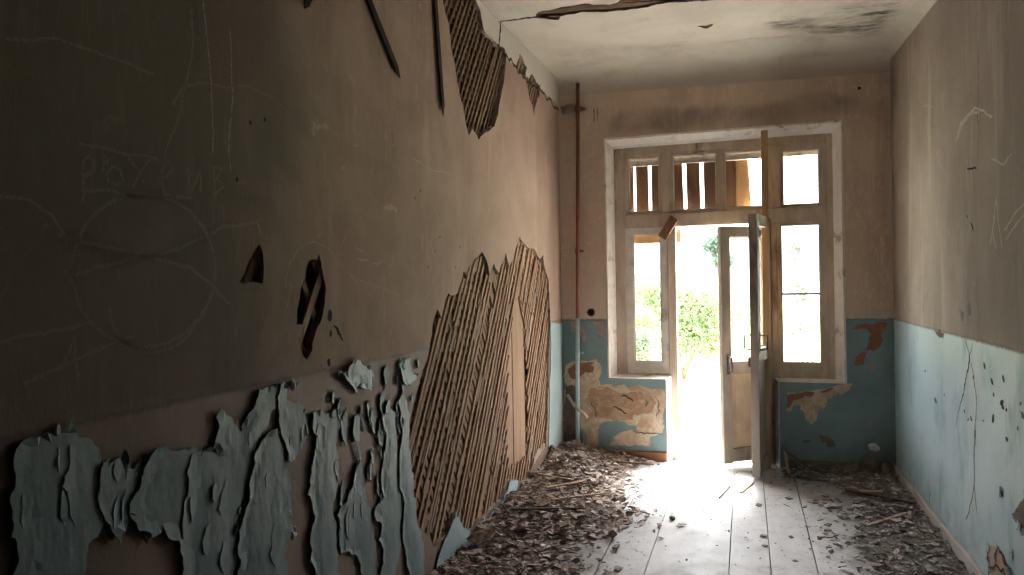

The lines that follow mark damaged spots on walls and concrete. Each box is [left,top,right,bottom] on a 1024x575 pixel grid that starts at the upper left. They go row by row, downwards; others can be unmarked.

flaking render [443,0,540,139]
crack [497,0,709,111]
water stain [824,11,890,33]
peeling [853,322,887,372]
flaking render [9,237,666,575]
peeling [787,383,853,448]
crack [955,340,977,519]
peeling [985,542,1014,575]